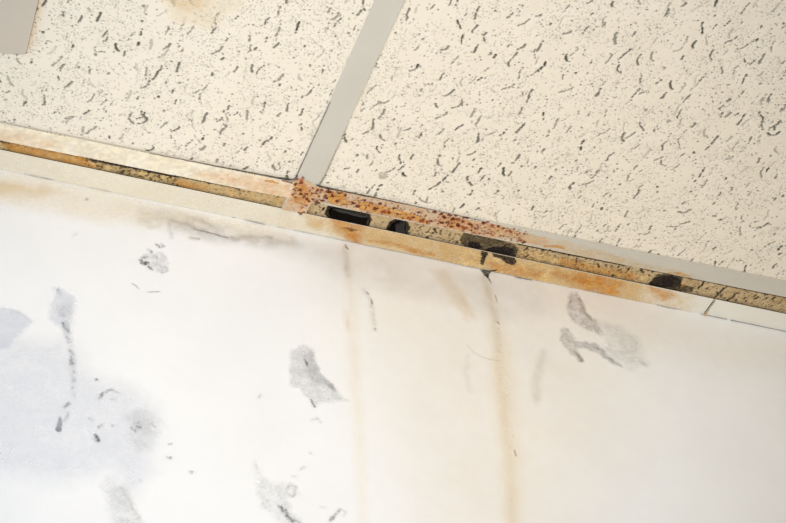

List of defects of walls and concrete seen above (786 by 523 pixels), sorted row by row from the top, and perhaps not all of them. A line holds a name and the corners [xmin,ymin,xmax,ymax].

corrosion [284,177,564,250]
corrosion [334,220,674,301]